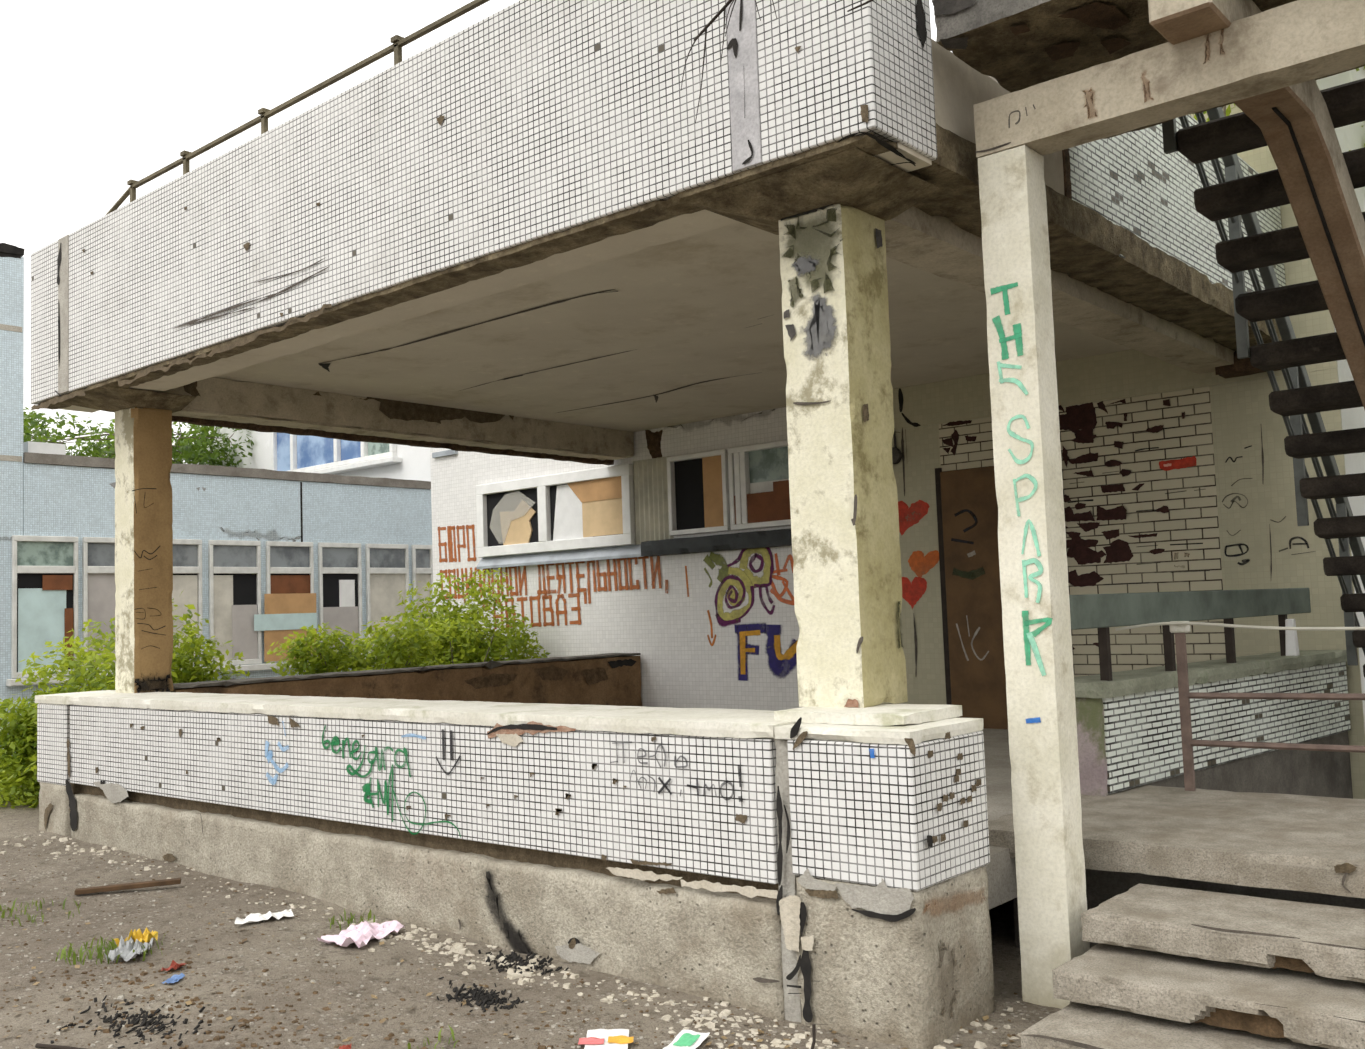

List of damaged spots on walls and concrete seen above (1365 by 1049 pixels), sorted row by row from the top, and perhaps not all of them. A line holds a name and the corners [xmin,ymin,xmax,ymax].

spalling [780,204,833,221]
peeling [792,256,819,276]
peeling [783,294,837,359]
peeling [352,397,514,424]
peeling [1058,399,1165,587]
spalling [486,721,576,747]
peeling [798,868,914,915]
spalling [1196,1008,1286,1038]